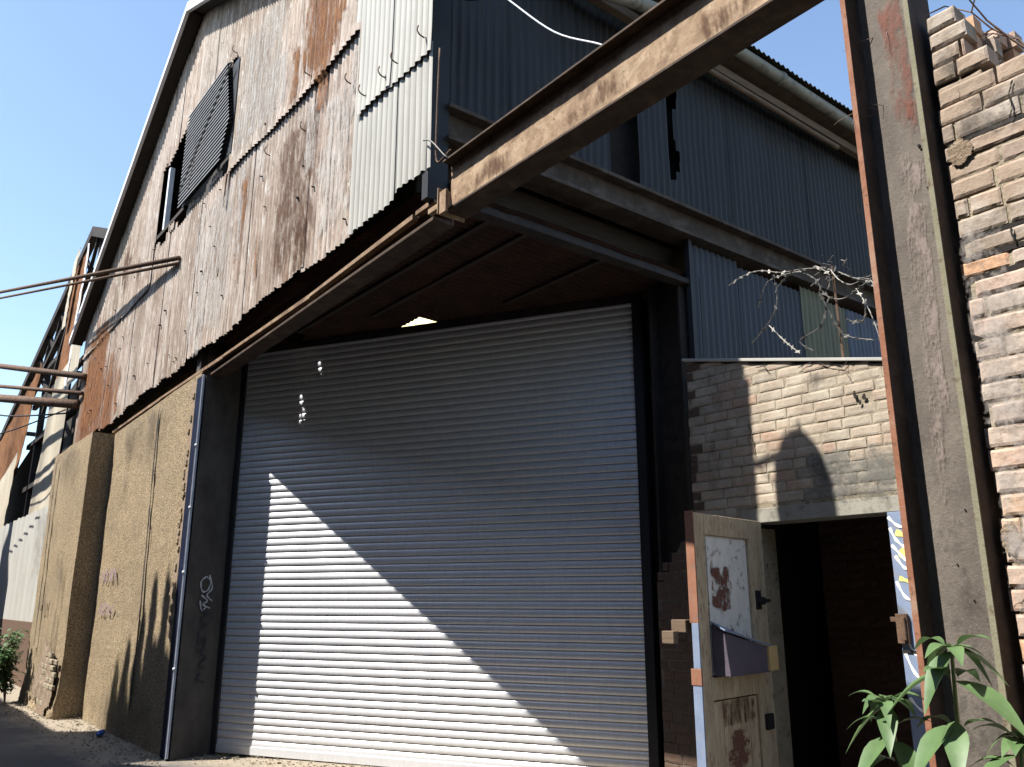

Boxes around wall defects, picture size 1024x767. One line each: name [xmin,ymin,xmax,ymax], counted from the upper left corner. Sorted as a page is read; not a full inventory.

rust [273,0,347,273]
rust [79,321,121,430]
flaking render [30,642,58,716]